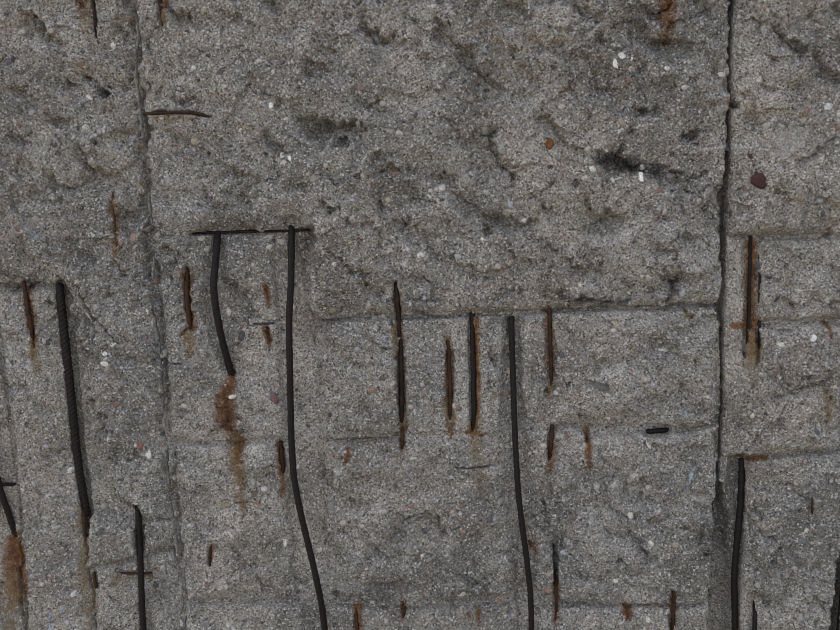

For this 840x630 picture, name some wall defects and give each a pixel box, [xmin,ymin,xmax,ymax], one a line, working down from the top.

rust [0,531,28,629]
rust [24,284,39,372]
spalling [55,283,91,539]
spalling [119,505,152,630]
rust [179,272,197,356]
rust [213,369,247,525]
spalling [192,225,328,630]
spalling [394,282,404,449]
rust [443,336,455,439]
spalling [508,315,534,630]
rust [730,238,761,368]
spalling [731,458,773,630]